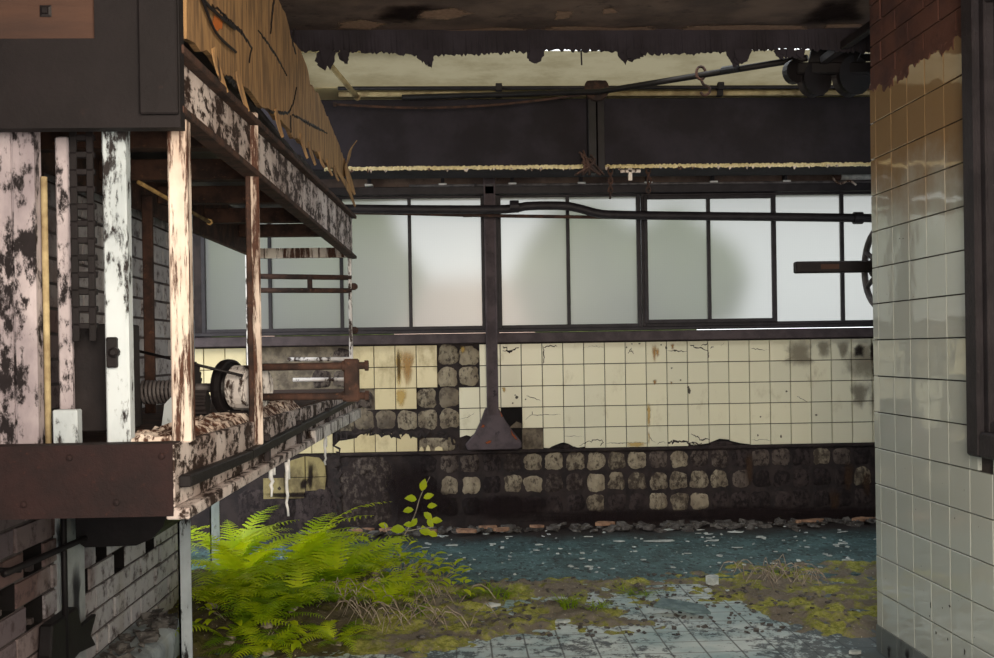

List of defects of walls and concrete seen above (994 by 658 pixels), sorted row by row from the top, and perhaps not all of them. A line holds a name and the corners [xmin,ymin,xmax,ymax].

peeling [211,47,250,112]
peeling [290,8,872,70]
peeling [869,27,961,92]
rust [396,355,413,404]
crack [668,343,724,358]
leakage [855,343,874,377]
crack [570,434,710,446]